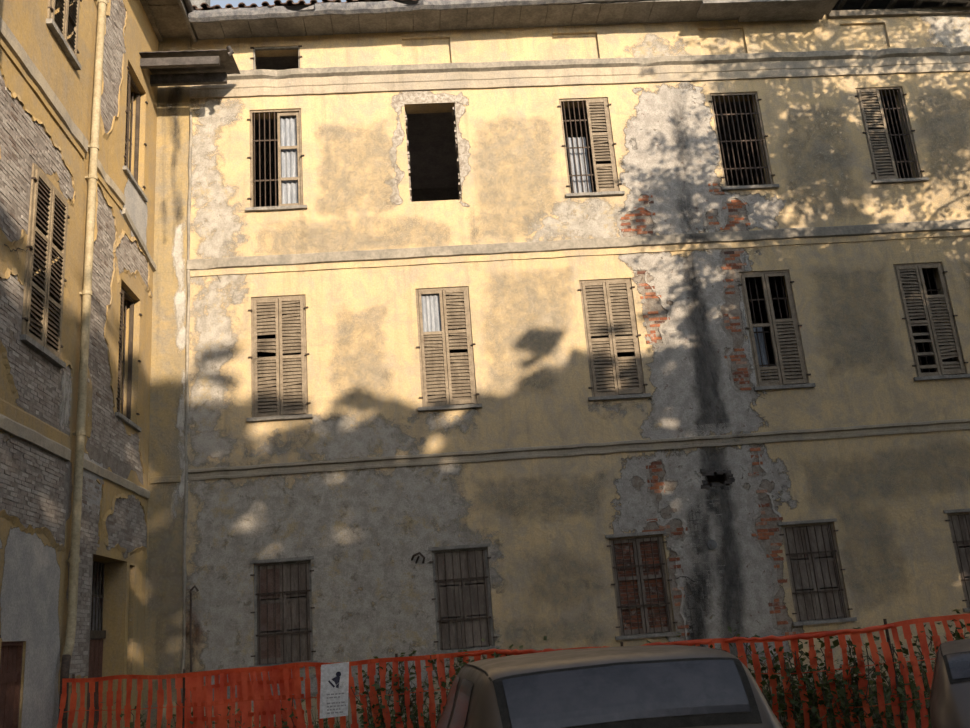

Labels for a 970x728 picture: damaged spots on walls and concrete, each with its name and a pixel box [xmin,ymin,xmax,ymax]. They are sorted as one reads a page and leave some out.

flaking render [0,65,76,249]
flaking render [100,0,127,140]
peeling [189,98,248,259]
flaking render [385,90,471,207]
peeling [523,81,786,242]
flaking render [0,267,73,436]
flaking render [86,181,153,485]
leakage [686,256,728,431]
flaking render [0,432,147,688]
peeling [186,274,503,705]
peeling [588,248,805,665]
leakage [685,485,742,656]